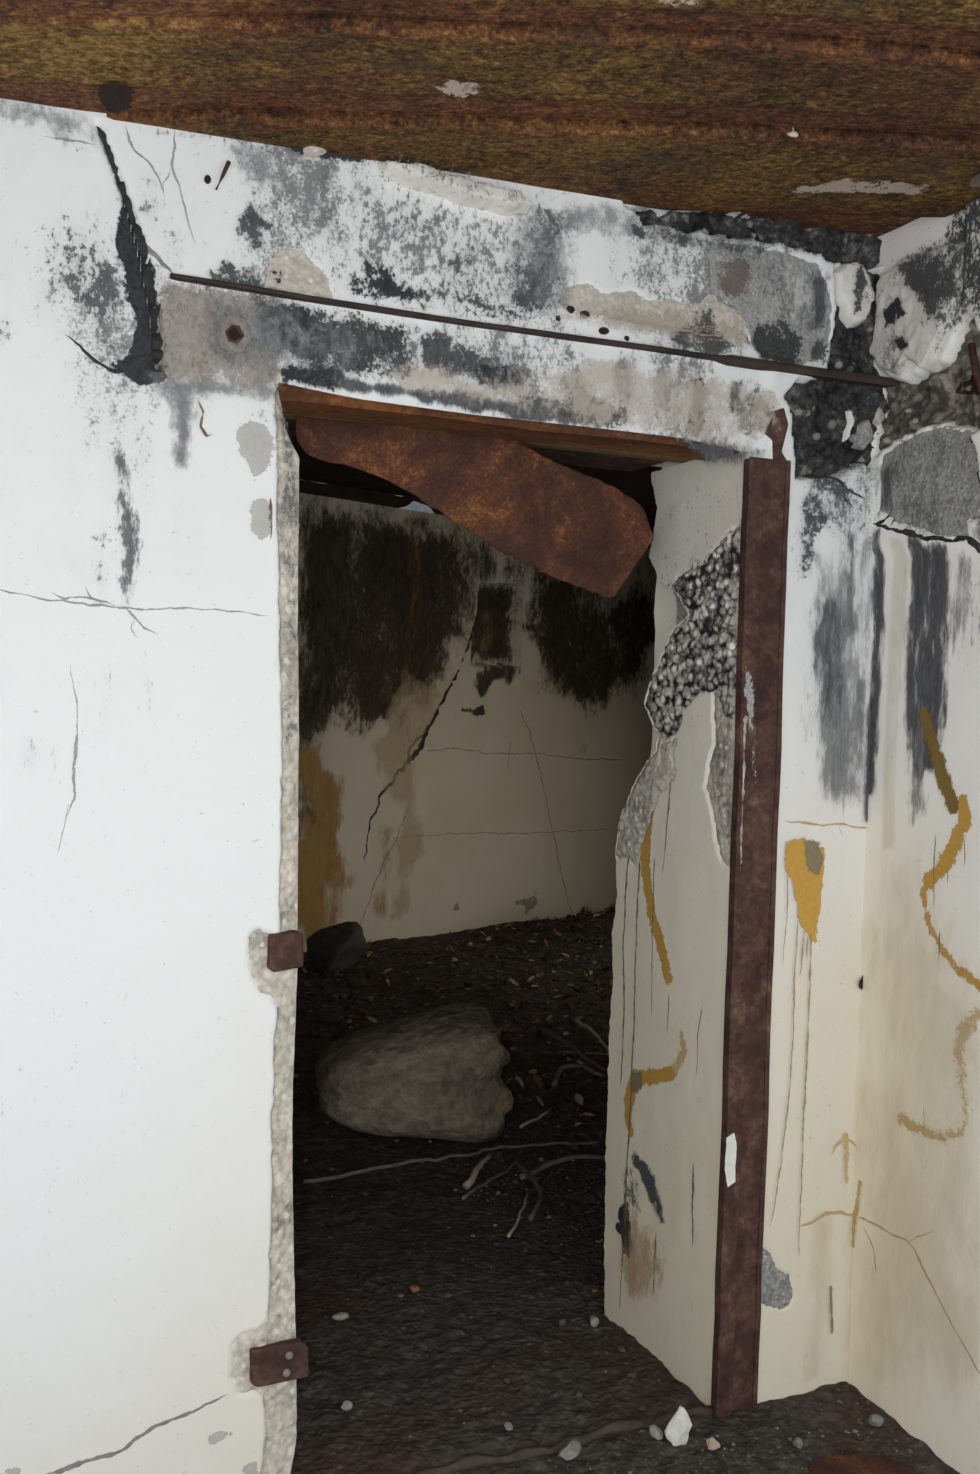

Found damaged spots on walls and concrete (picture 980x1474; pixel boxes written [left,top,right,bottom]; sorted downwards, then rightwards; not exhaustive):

damp [38,135,832,463]
spalling [556,209,980,537]
damp [944,198,980,318]
corrosion [295,416,653,598]
crack [806,474,980,553]
crack [0,589,267,637]
damp [462,584,516,716]
crack [360,542,619,925]
spalling [616,522,757,866]
damp [799,432,980,822]
crack [6,1394,259,1474]